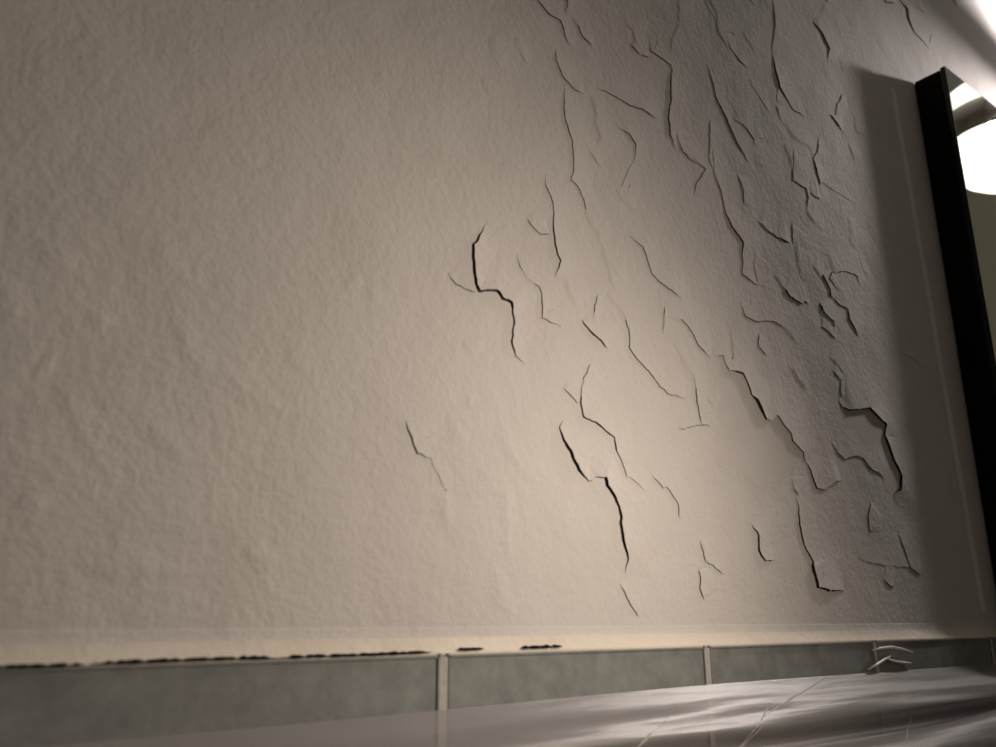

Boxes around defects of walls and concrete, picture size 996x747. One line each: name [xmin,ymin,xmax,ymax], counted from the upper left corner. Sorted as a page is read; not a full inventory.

peeling [538,0,594,46]
peeling [597,33,695,152]
peeling [448,224,537,364]
peeling [527,176,581,285]
flaking render [622,0,922,517]
peeling [559,371,654,617]